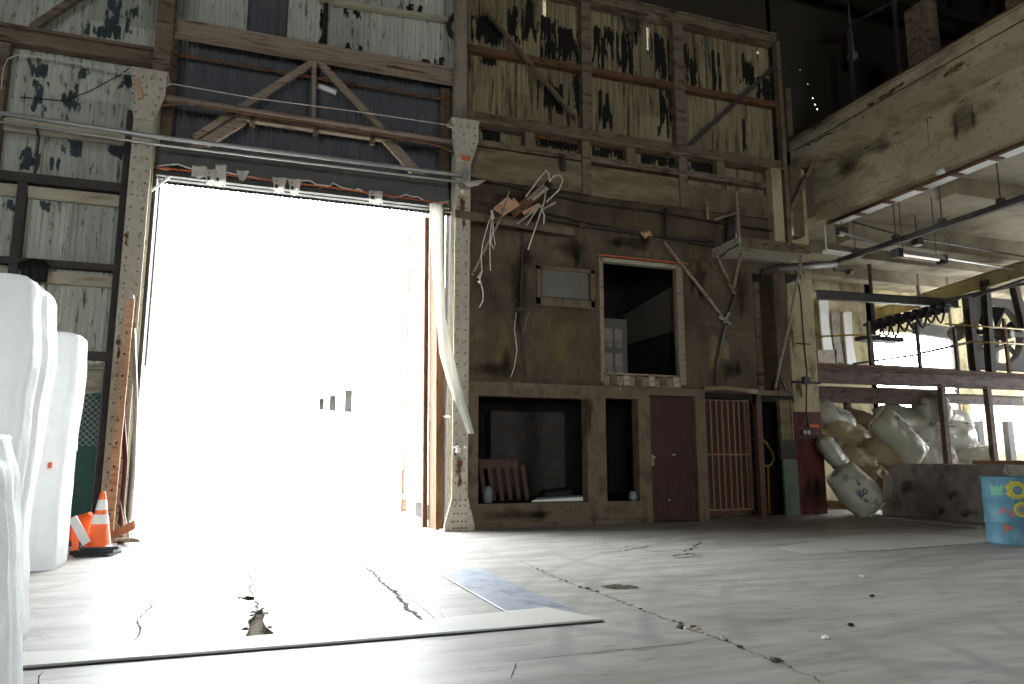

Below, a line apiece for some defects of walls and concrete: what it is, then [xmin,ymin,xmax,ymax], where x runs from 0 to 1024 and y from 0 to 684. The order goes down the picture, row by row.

peeling [82,0,139,40]
peeling [27,58,90,113]
peeling [117,73,132,89]
peeling [471,0,579,117]
peeling [592,25,672,138]
peeling [683,43,697,86]
peeling [19,140,83,171]
peeling [108,145,124,160]
peeling [481,130,500,142]
corrosion [454,444,463,486]
crack [364,564,423,620]
crack [506,560,824,684]